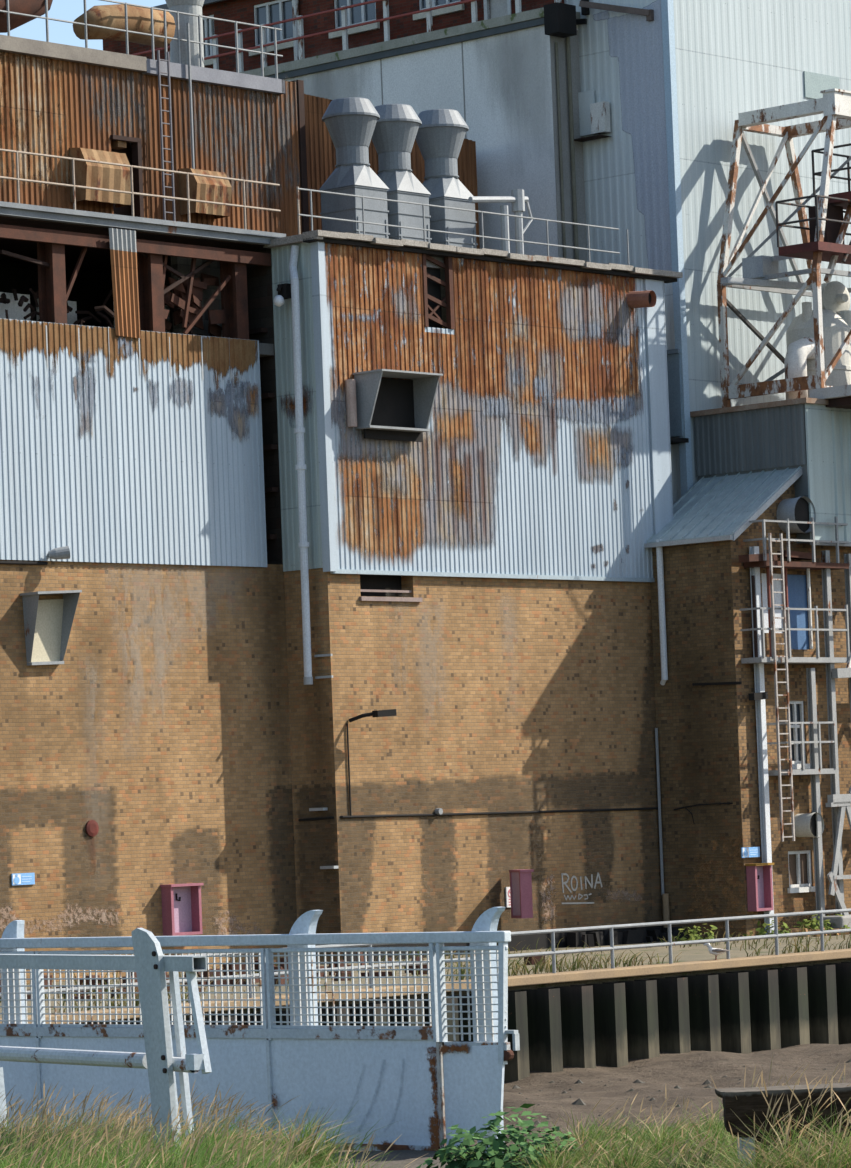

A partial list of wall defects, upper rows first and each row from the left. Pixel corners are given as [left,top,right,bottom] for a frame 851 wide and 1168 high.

corrosion [0,53,74,191]
corrosion [0,318,258,390]
corrosion [325,243,643,423]
corrosion [339,454,424,560]
water stain [172,626,663,935]
water stain [0,787,120,950]
corrosion [427,1044,468,1146]